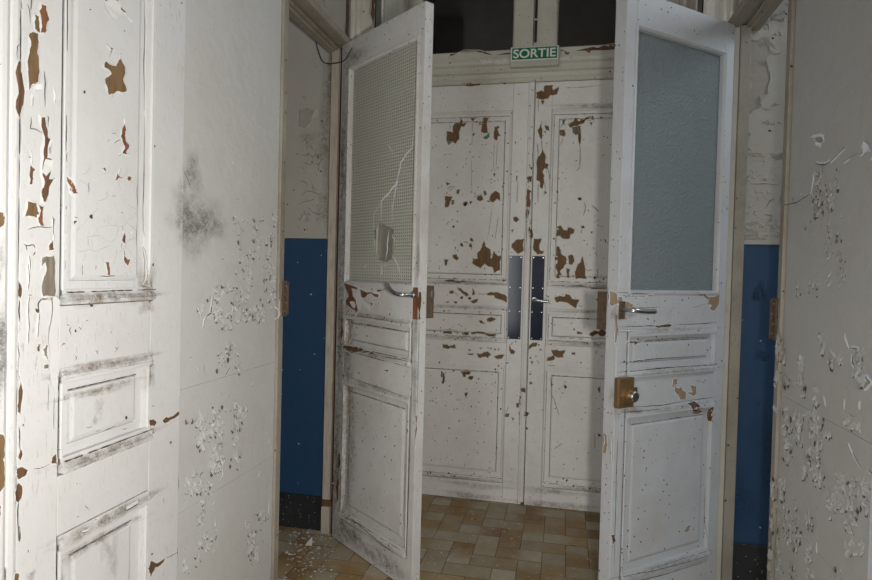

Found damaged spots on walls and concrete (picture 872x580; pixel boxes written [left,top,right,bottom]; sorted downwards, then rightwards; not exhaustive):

peeling [102,43,128,96]
peeling [108,119,131,157]
peeling [13,0,89,396]
peeling [16,343,24,415]
peeling [196,212,278,376]
peeling [340,282,419,372]
peeling [504,342,582,430]
peeling [547,197,689,345]
peeling [615,357,715,423]
peeling [0,426,61,543]
peeling [147,399,248,579]
peeling [767,332,872,580]